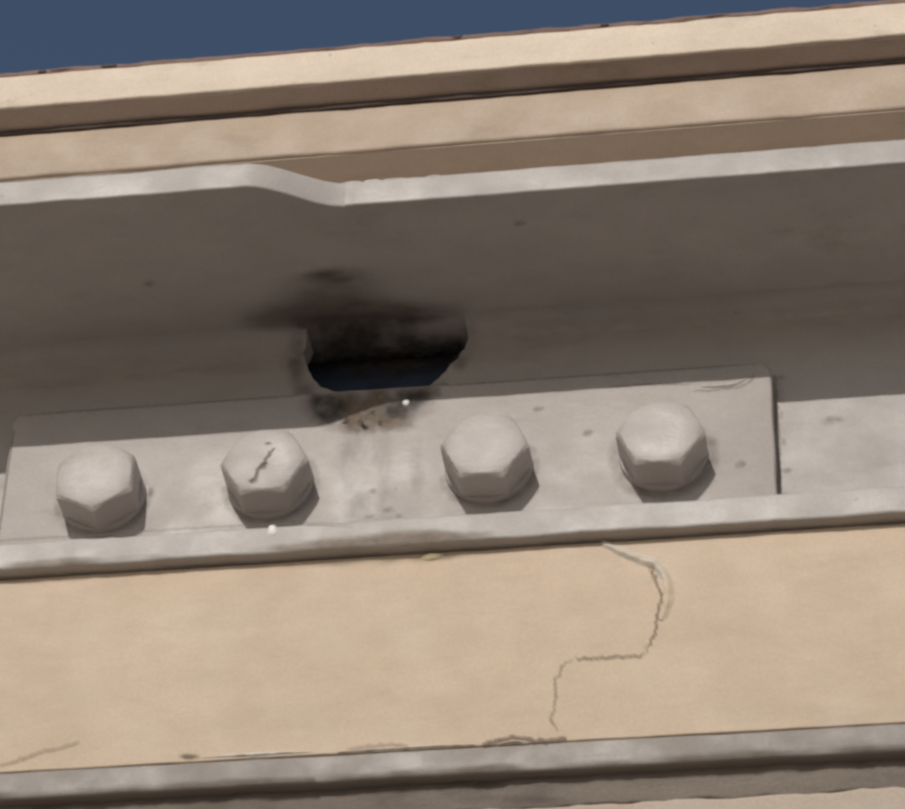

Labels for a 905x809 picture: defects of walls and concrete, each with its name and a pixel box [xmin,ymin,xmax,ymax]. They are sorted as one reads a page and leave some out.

damp [311,322,465,362]
damp [386,390,428,418]
crack [254,443,275,479]
crack [575,568,663,660]